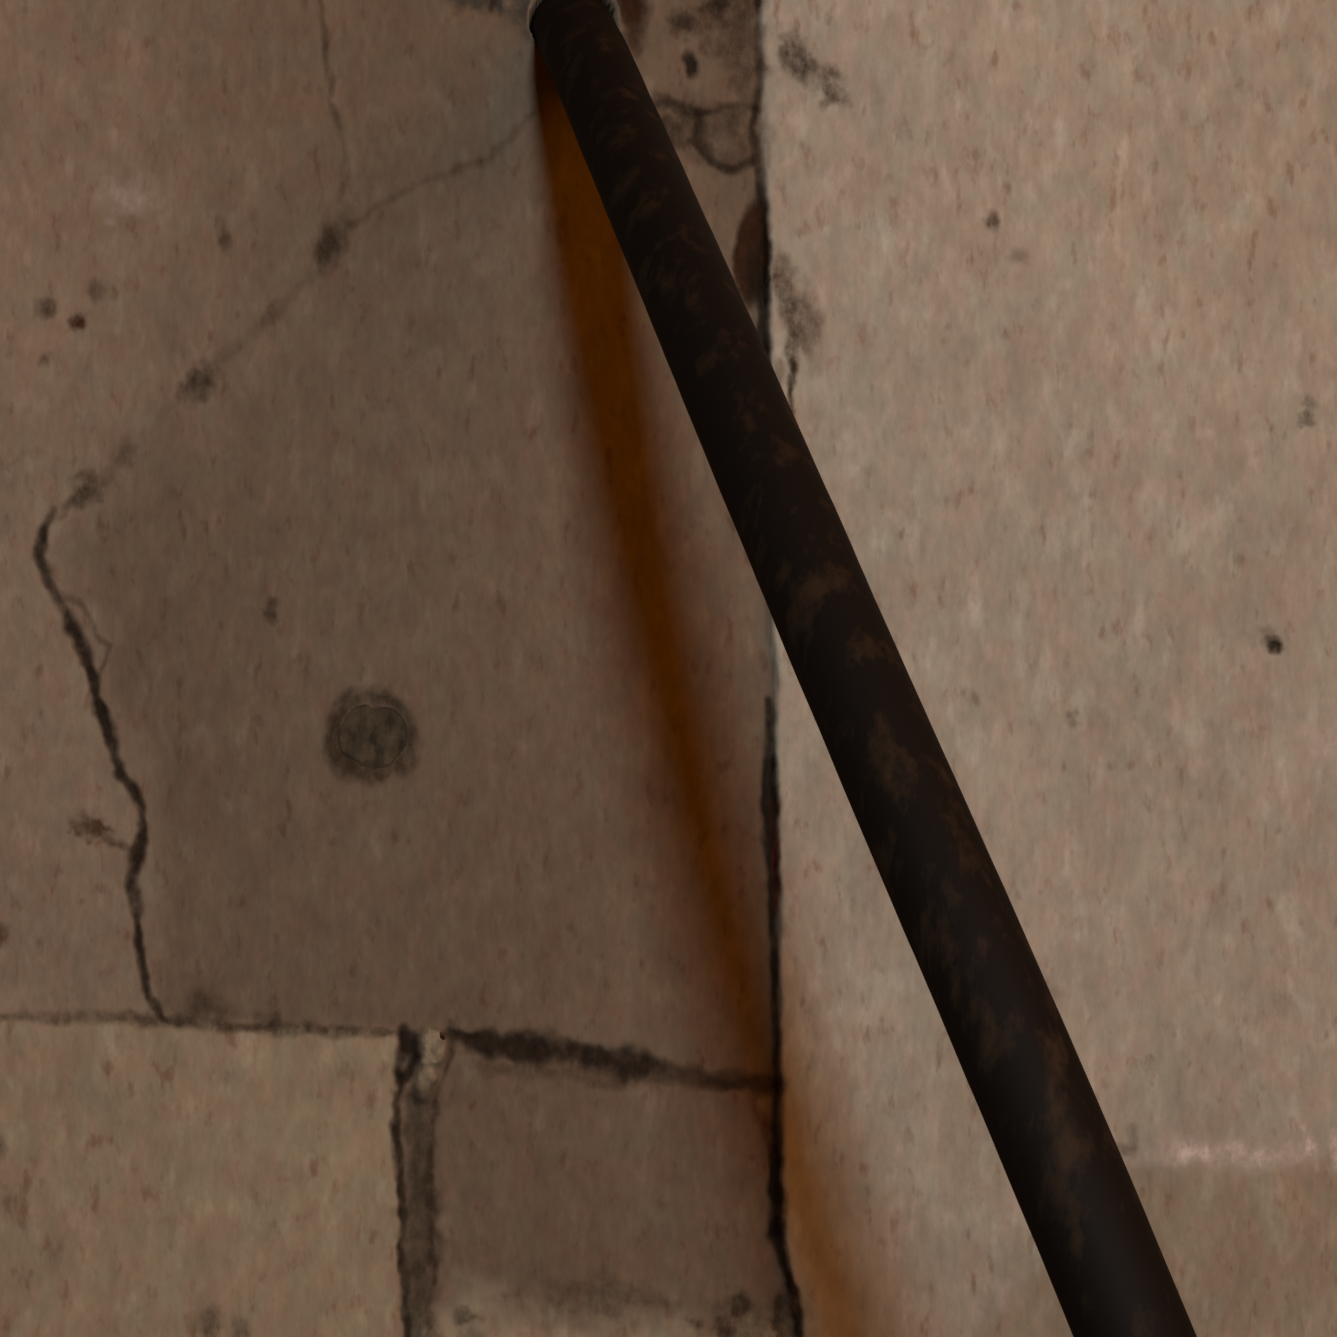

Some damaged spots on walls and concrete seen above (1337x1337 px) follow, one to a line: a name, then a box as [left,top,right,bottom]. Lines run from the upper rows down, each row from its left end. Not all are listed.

crack [317,228,340,263]
water stain [787,312,804,414]
crack [35,480,164,1023]